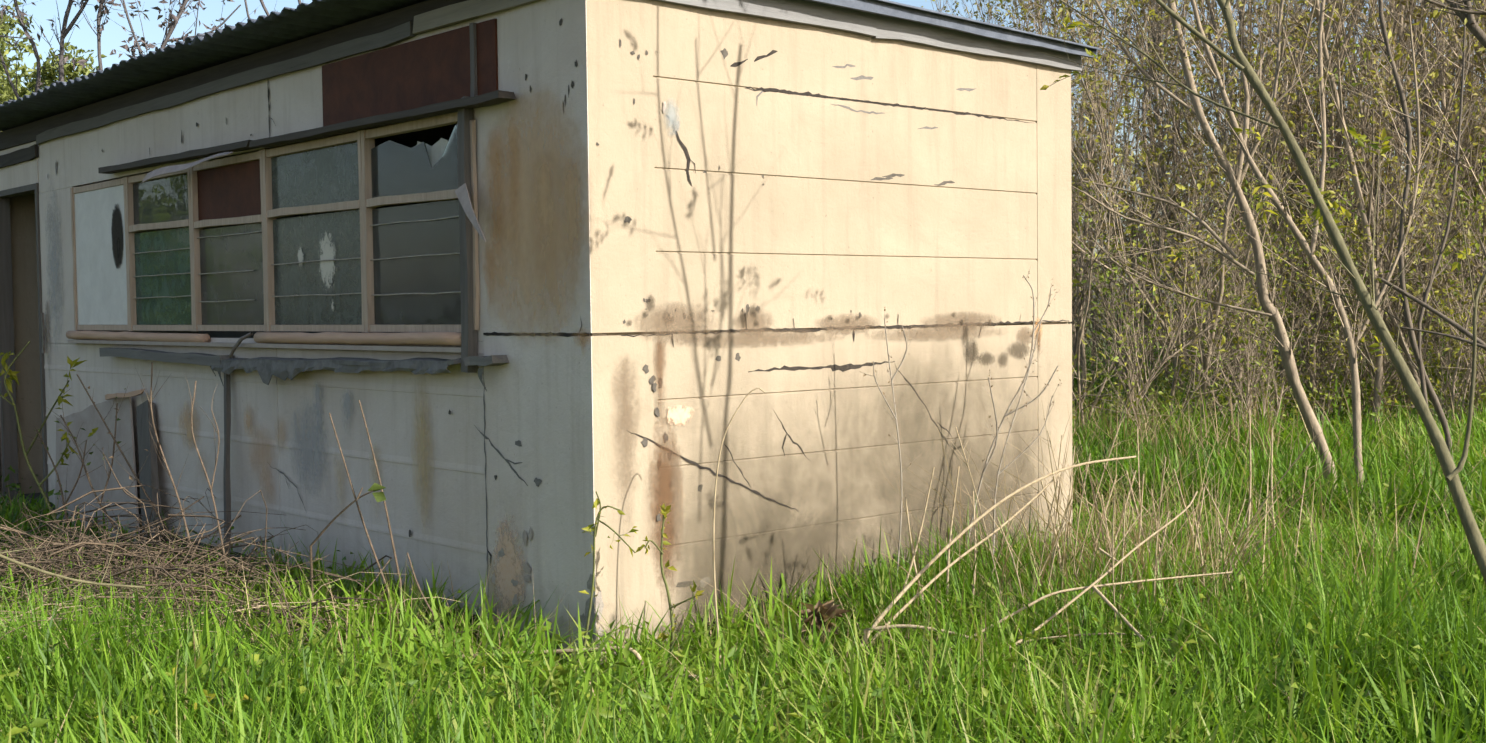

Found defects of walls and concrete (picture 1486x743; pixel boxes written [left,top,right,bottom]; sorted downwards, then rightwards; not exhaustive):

crack [746,87,1030,123]
crack [666,114,696,186]
damp [713,304,808,344]
damp [825,310,868,332]
crack [483,314,1066,599]